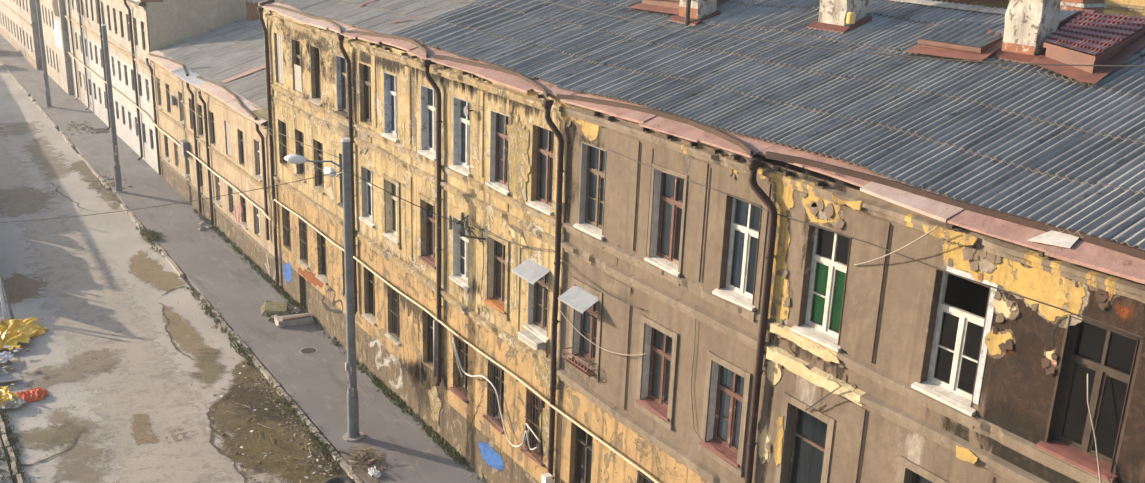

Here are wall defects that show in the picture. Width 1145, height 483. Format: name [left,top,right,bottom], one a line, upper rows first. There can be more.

peeling [756,182,862,483]
peeling [922,224,1121,359]
peeling [1041,349,1058,375]